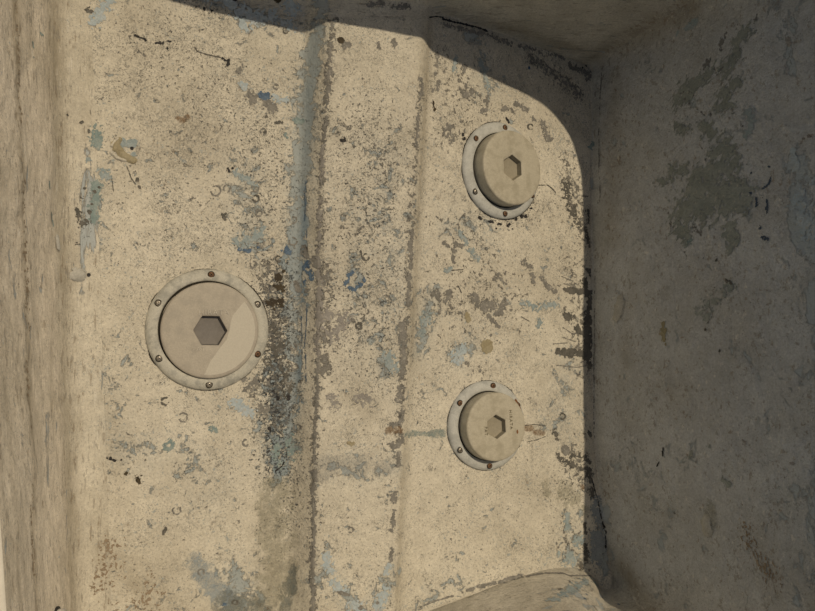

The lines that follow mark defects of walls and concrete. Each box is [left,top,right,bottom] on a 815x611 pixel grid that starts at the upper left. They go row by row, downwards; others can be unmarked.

peeling [203,0,304,34]
crack [429,16,488,32]
peeling [652,20,771,262]
peeling [389,491,398,533]